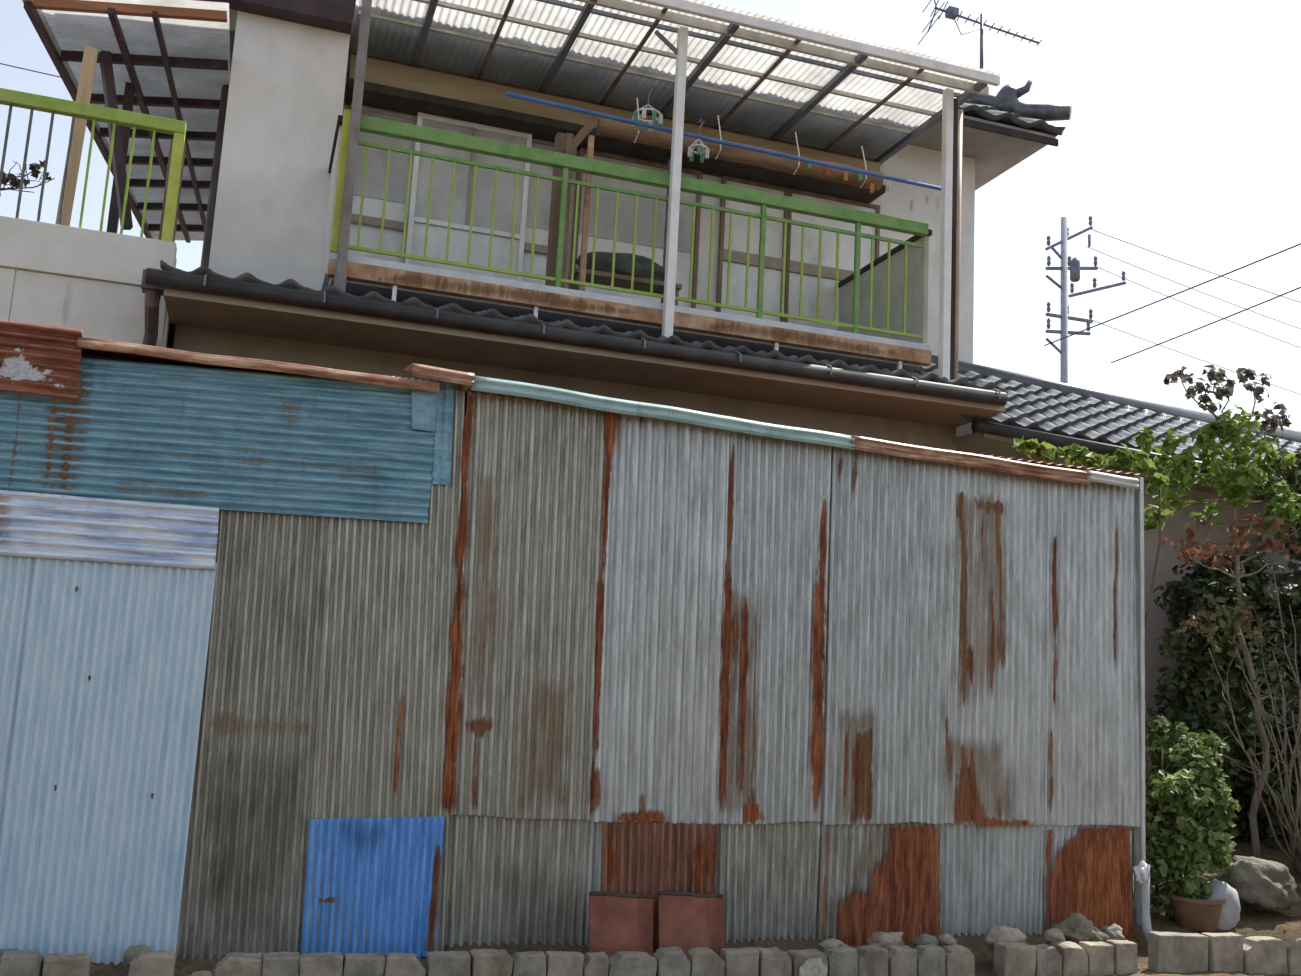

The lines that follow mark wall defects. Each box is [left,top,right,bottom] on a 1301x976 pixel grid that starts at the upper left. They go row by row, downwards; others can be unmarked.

peeling [0,348,64,389]
rust [442,395,493,814]
rust [587,411,619,813]
rust [719,446,765,823]
rust [810,499,827,809]
rust [956,492,1005,705]
rust [607,793,665,883]
rust [844,728,873,823]
rust [822,824,942,946]
rust [945,716,1134,939]